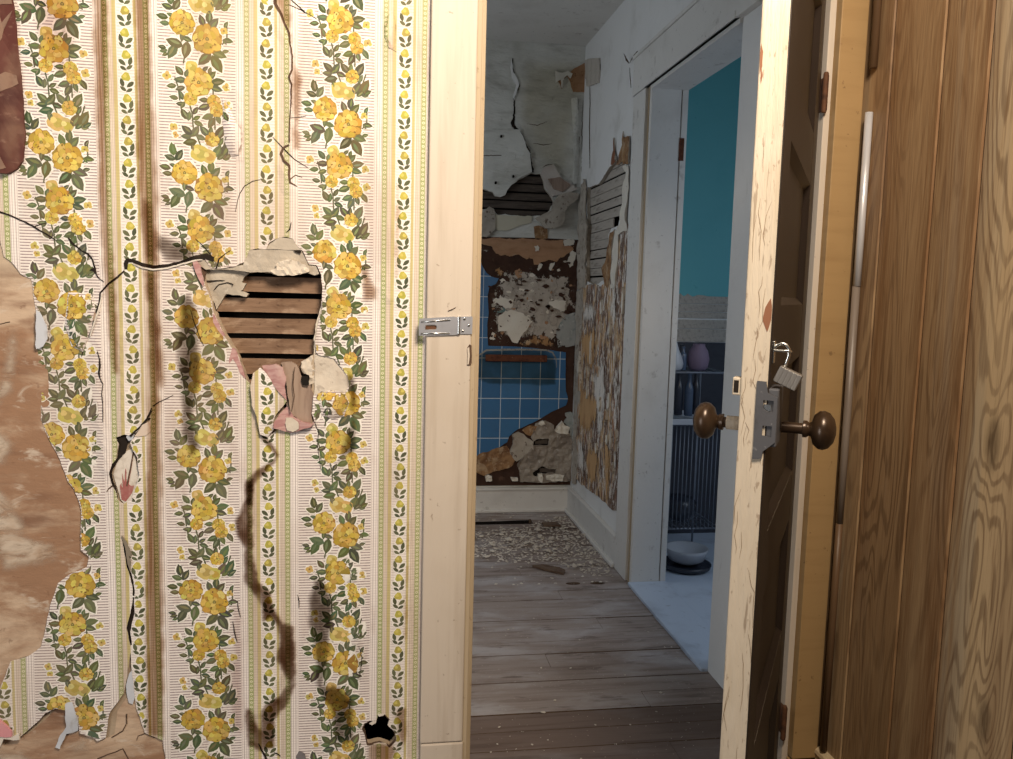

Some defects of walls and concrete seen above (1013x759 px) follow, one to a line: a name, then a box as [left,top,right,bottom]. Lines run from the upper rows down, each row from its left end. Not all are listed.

peeling [0,0,26,175]
crack [273,0,315,186]
crack [510,58,552,173]
flaking render [0,242,89,687]
crack [0,211,229,497]
peeling [135,421,151,437]
spalling [192,237,349,395]
spalling [476,129,630,511]
crack [122,536,135,645]
leakage [236,435,295,748]
flaking render [0,698,165,759]
spalling [364,714,395,746]